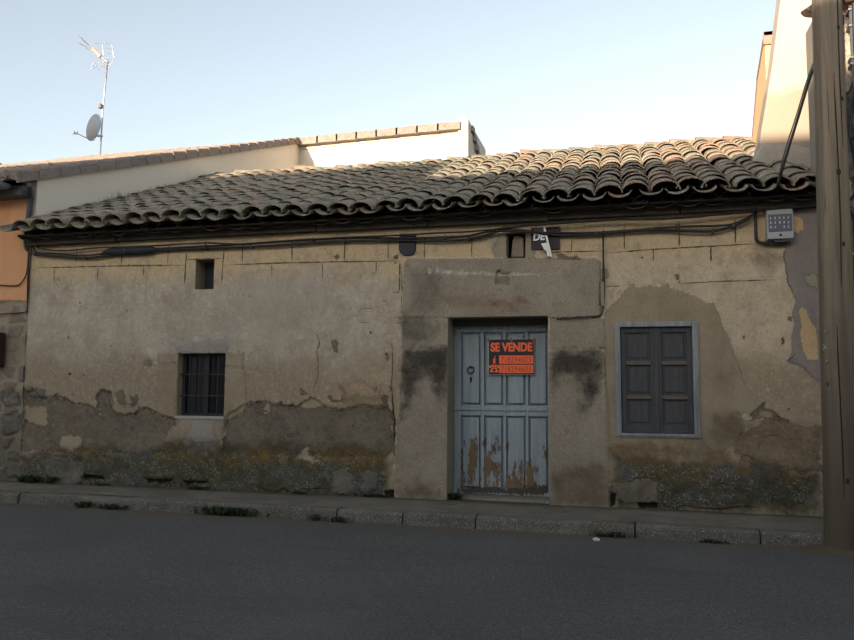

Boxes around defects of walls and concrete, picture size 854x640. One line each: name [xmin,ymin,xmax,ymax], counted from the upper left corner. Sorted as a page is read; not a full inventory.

leakage [402,349,447,393]
leakage [554,353,600,396]
spalling [742,403,790,427]
flaking render [45,456,84,484]
peeling [457,436,548,496]